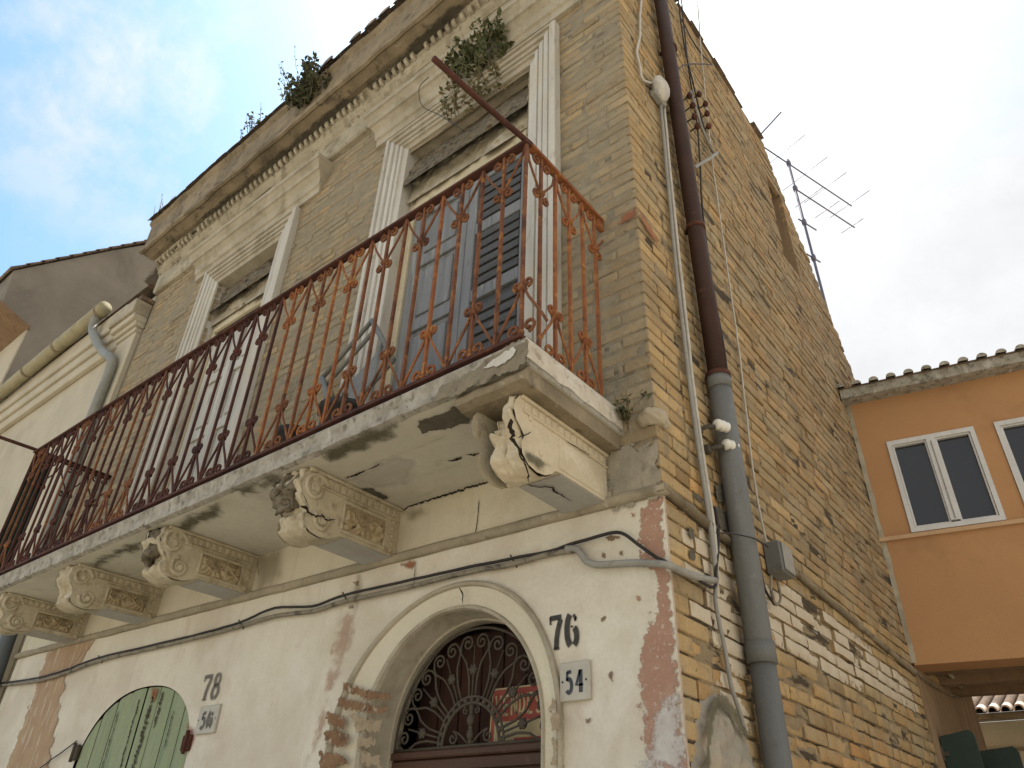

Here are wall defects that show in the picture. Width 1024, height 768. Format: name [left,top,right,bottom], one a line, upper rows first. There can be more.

spalling [417,338,529,434]
crack [507,419,571,501]
crack [301,506,356,528]
crack [403,481,488,532]
peeling [631,495,687,768]
peeling [6,631,98,768]
spalling [318,682,391,768]